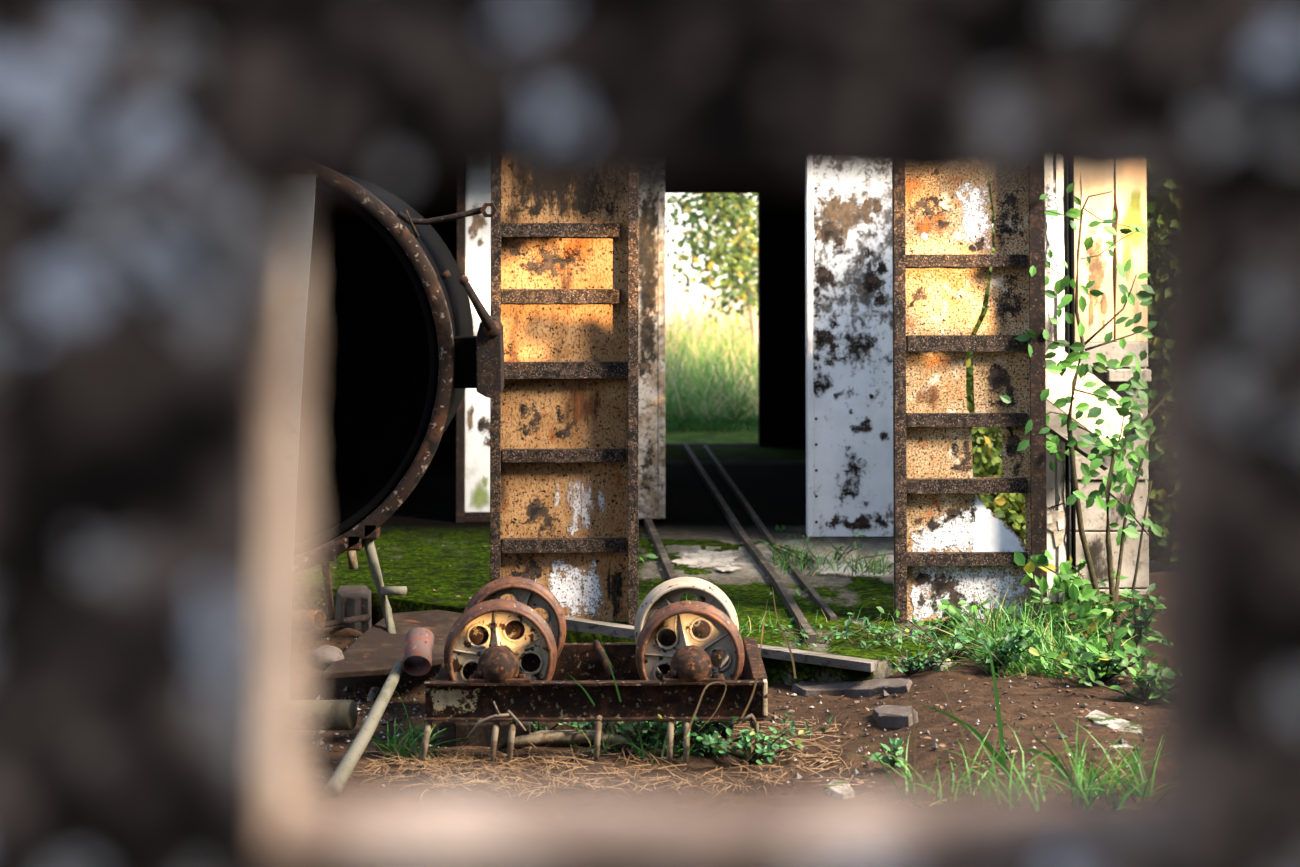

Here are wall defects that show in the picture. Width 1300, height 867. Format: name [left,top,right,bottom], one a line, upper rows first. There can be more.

rust [917,213,947,235]
peeling [955,188,991,253]
rust [917,385,939,407]
peeling [554,478,606,536]
peeling [909,494,1029,622]
peeling [534,559,603,617]